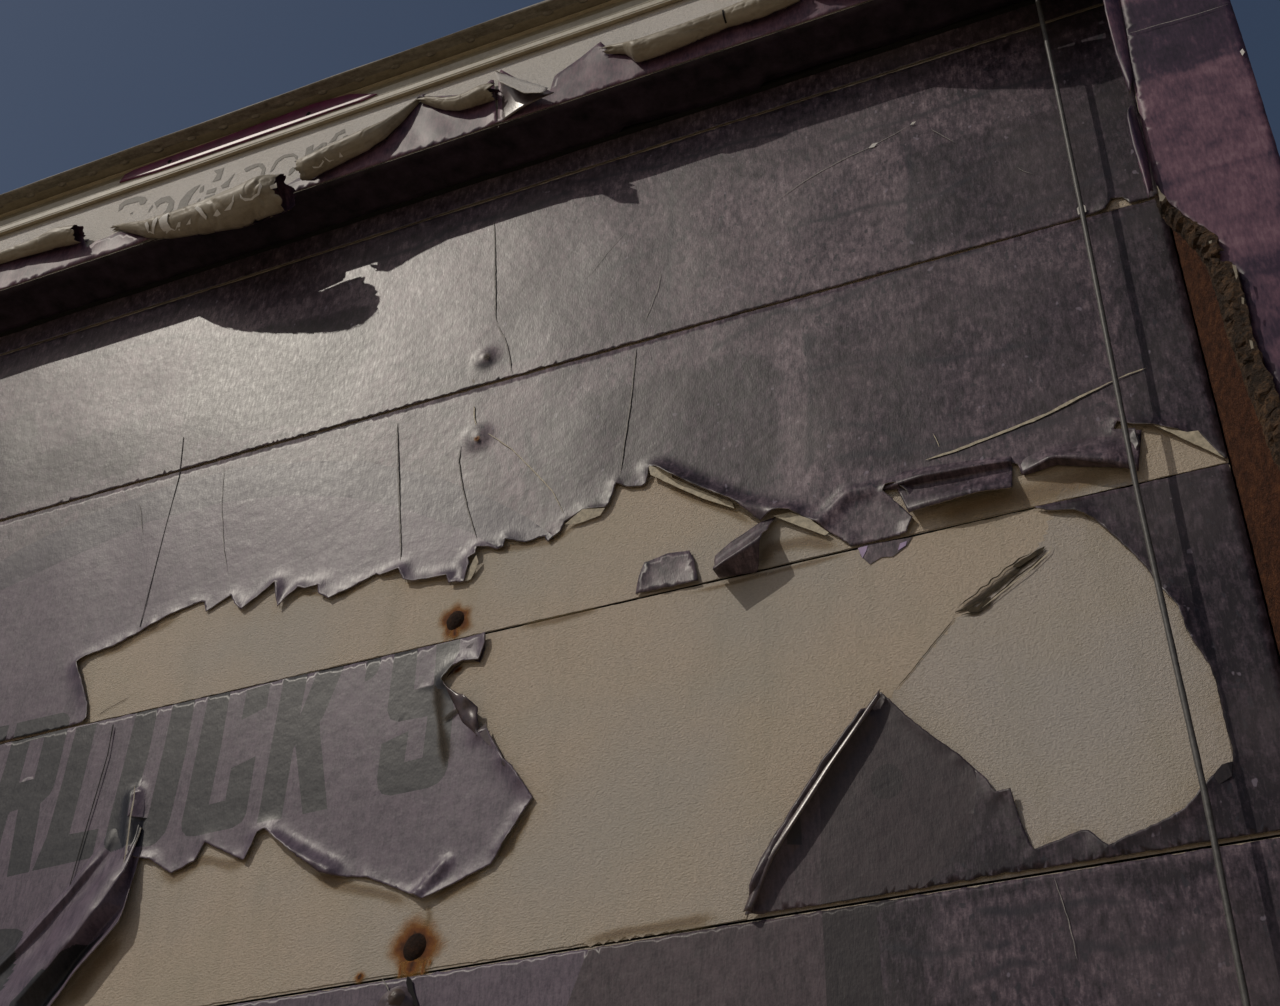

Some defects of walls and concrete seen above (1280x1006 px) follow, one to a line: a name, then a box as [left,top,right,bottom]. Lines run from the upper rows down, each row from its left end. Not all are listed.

peeling [0,0,743,251]
corrosion [1155,186,1280,471]
corrosion [441,605,470,638]
peeling [51,424,1233,1006]
corrosion [392,920,440,977]